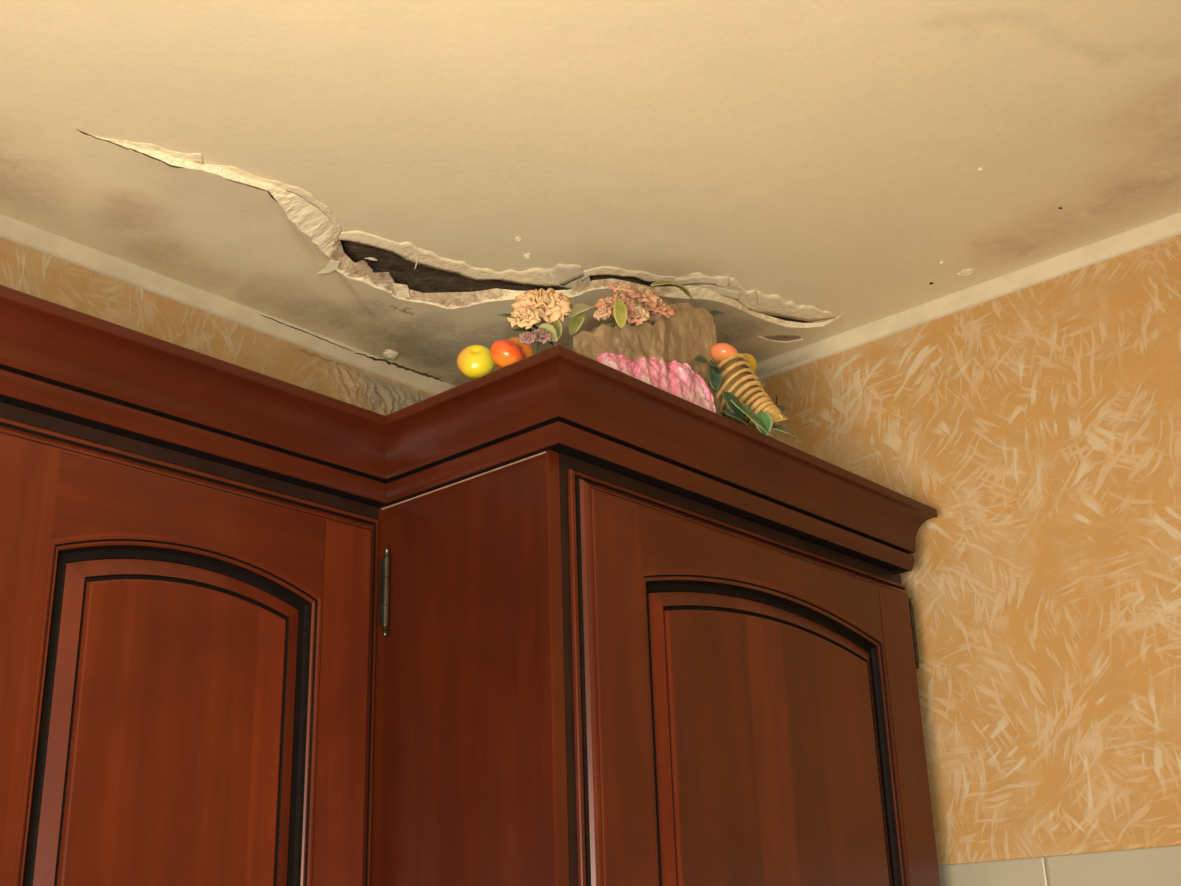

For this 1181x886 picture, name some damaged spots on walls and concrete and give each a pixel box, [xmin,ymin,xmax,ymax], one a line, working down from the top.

flaking render [123,140,836,322]
damp [389,324,500,364]
flaking render [758,335,803,343]